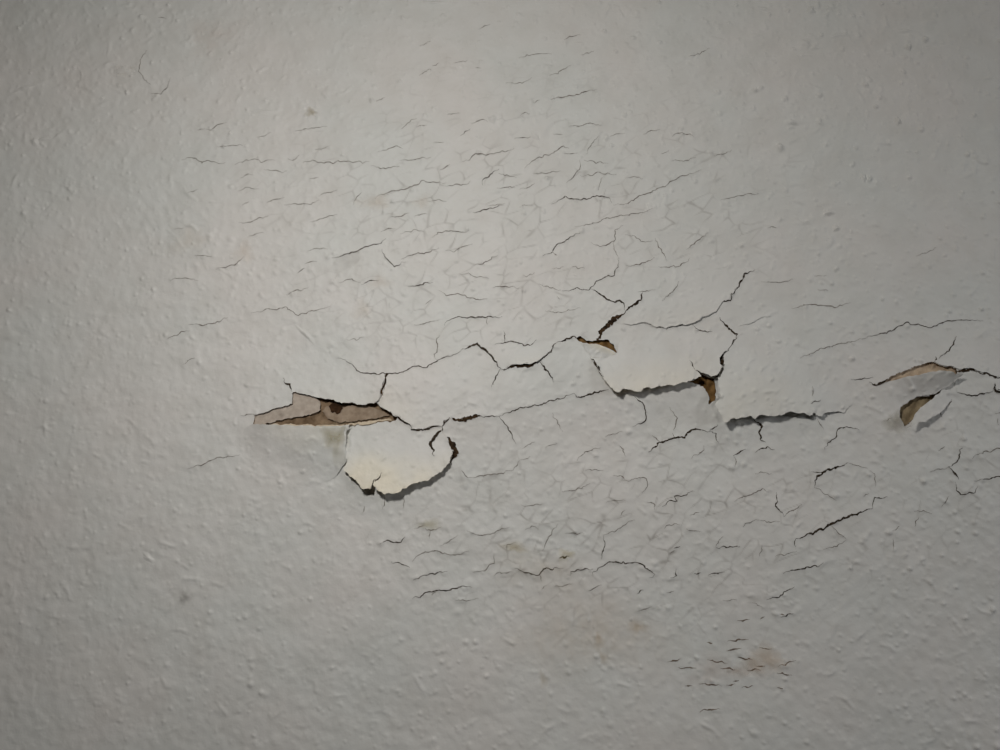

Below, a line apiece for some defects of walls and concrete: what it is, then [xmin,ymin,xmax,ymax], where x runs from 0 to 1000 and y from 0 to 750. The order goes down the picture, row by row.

peeling [253,358,486,494]
crack [188,35,727,478]
crack [693,271,751,377]
peeling [489,262,1000,426]
crack [802,319,1000,421]
crack [384,386,887,712]
crack [893,447,1000,546]